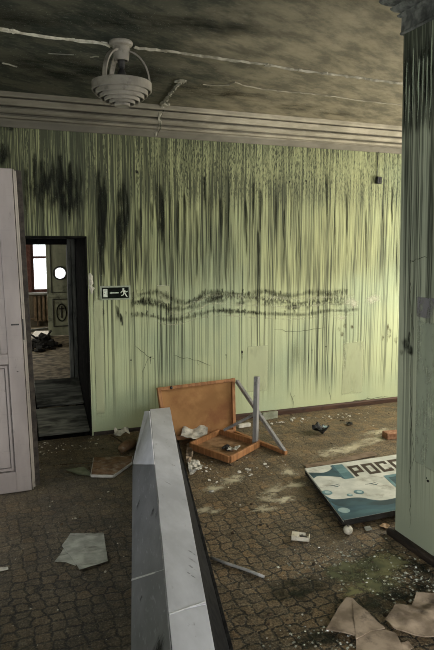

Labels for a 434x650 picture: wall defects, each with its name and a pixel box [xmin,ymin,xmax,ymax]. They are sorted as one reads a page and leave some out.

crack [0,27,111,58]
crack [133,46,403,85]
water stain [53,156,82,217]
water stain [97,172,107,271]
water stain [117,181,129,276]
water stain [152,187,186,251]
water stain [220,180,230,279]
water stain [245,183,262,275]
water stain [275,197,299,237]
water stain [132,289,343,323]
water stain [327,553,432,608]
water stain [298,632,340,649]